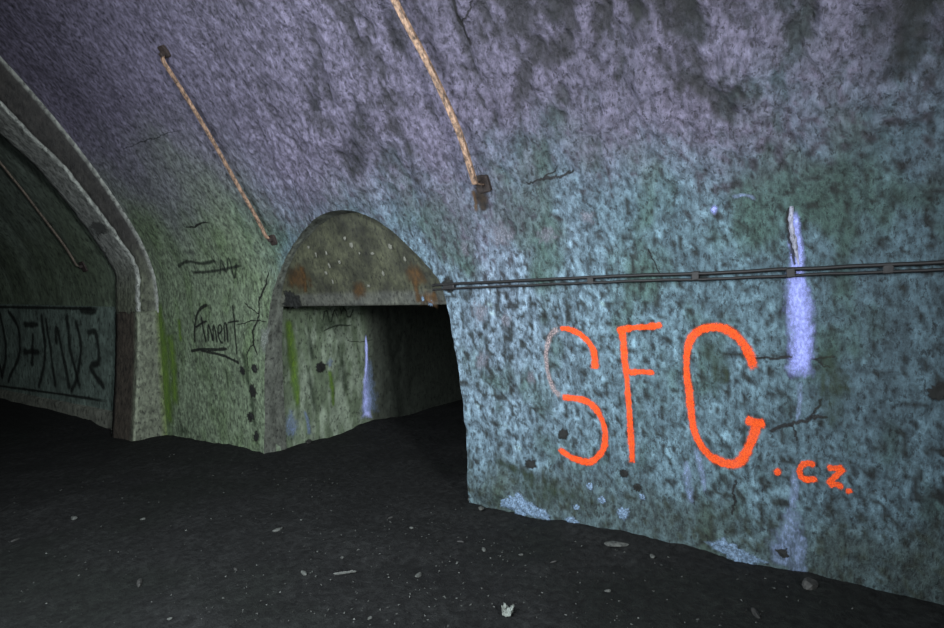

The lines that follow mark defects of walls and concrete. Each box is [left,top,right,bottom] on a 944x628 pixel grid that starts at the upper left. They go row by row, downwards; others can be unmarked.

rust [0,161,88,272]
rust [157,44,278,245]
rust [390,0,492,211]
leakage [789,216,813,372]
crack [770,399,827,441]